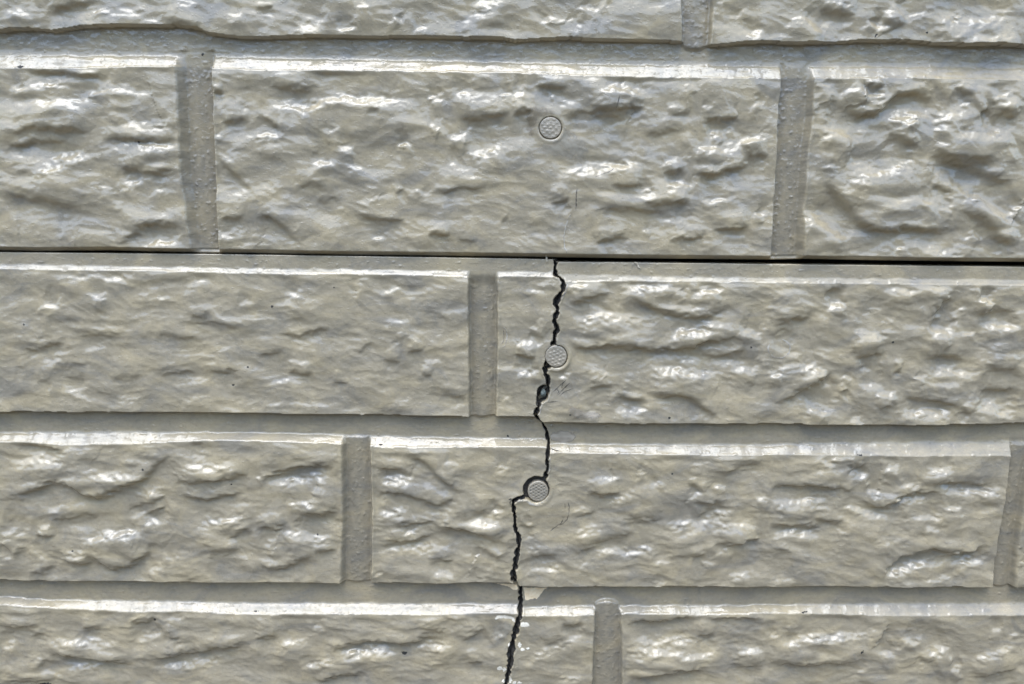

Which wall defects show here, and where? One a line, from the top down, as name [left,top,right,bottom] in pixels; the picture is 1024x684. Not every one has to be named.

crack [504,257,570,684]